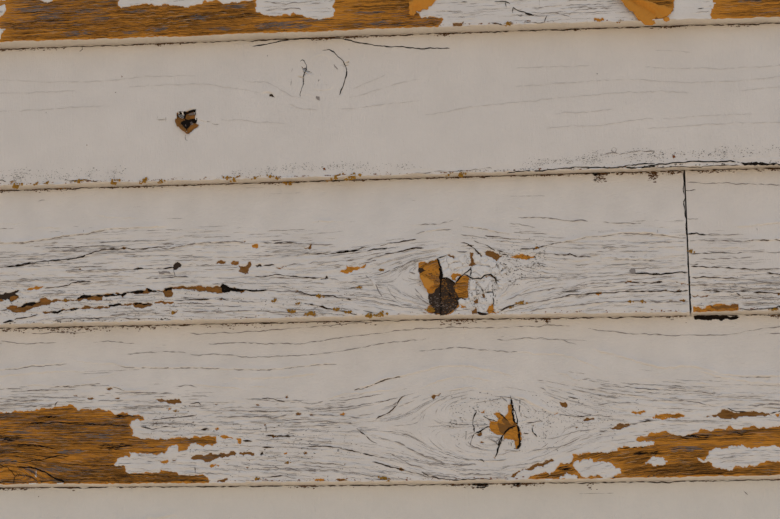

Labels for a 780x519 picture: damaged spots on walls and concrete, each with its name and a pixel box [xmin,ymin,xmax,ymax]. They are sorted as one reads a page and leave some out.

peeling [0,0,443,42]
peeling [645,0,674,22]
peeling [710,0,780,19]
peeling [175,111,196,134]
peeling [0,286,223,314]
peeling [217,260,262,274]
peeling [418,246,539,315]
crack [0,210,780,484]
peeling [0,395,263,485]
peeling [476,404,522,449]
peeling [511,409,780,479]